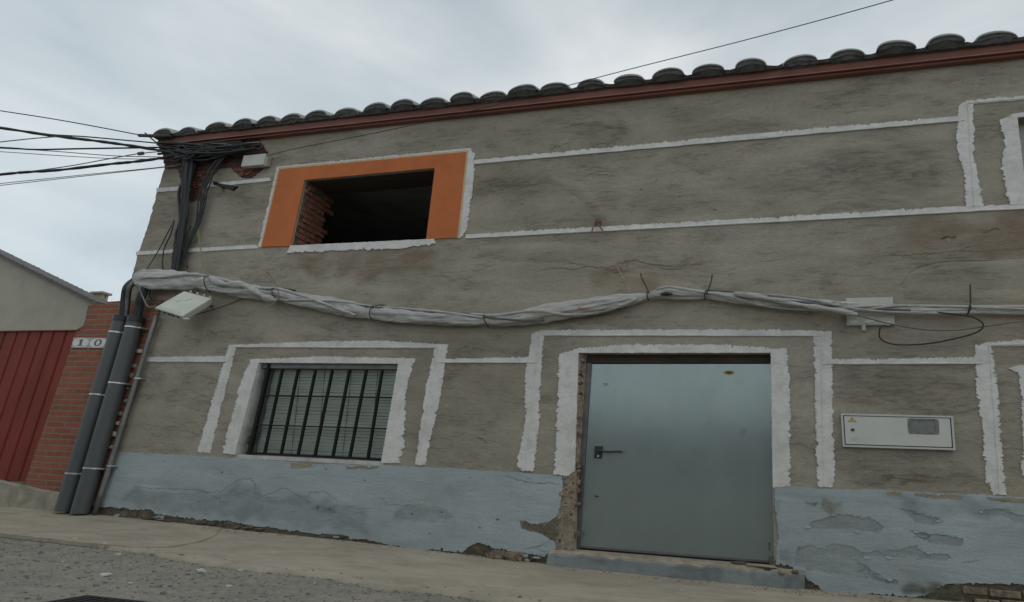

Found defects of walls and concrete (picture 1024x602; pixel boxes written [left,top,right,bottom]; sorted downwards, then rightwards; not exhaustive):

spalling [163,140,268,202]
crack [543,260,706,273]
spalling [429,353,587,564]
spalling [90,505,406,548]
peeling [768,492,1024,602]